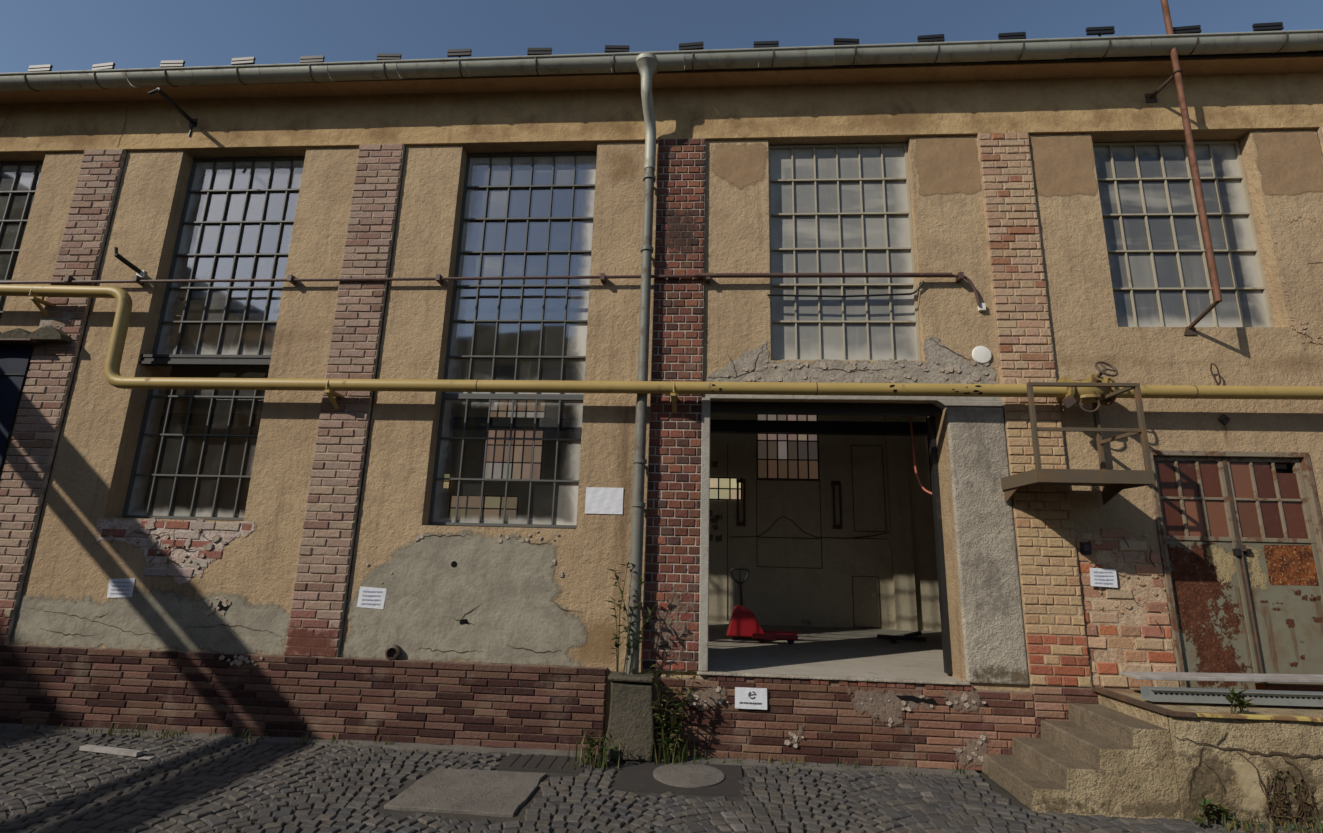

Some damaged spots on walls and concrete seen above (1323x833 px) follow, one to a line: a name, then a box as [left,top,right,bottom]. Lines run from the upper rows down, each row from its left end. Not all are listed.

flaking render [703,337,999,394]
flaking render [94,517,256,586]
spalling [207,596,231,616]
rust [1167,535,1253,689]
rust [1260,545,1323,667]
spalling [845,685,991,767]
crack [1175,731,1323,800]